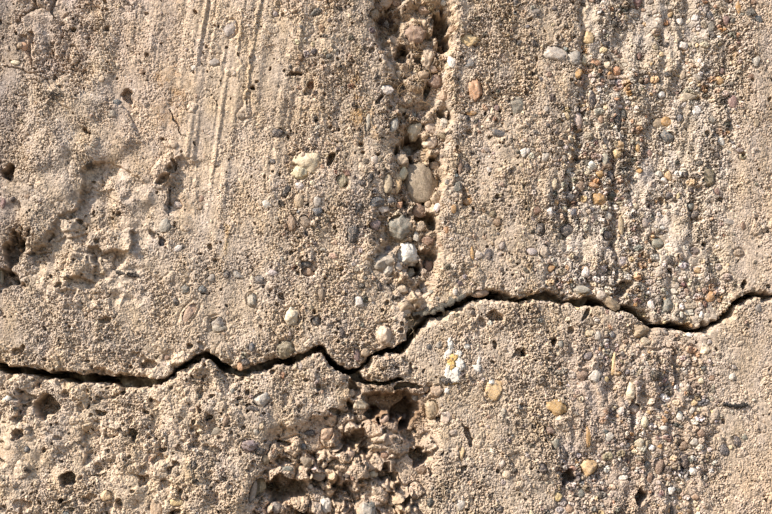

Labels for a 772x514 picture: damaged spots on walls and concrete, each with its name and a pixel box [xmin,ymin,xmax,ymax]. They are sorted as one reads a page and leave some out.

crack [0,290,772,390]
spalling [248,377,451,514]